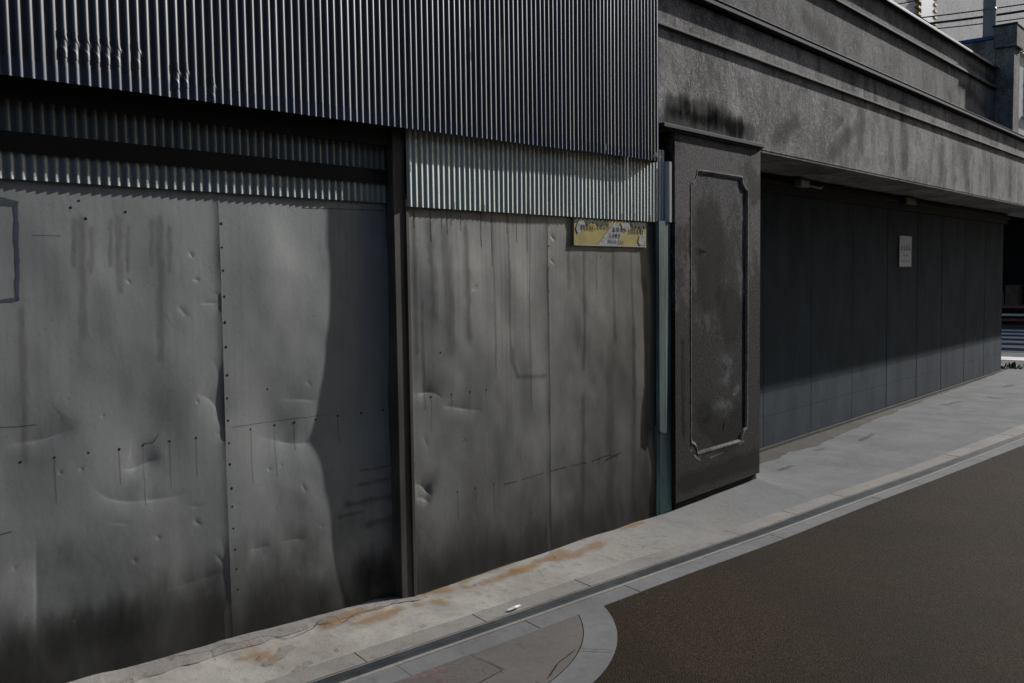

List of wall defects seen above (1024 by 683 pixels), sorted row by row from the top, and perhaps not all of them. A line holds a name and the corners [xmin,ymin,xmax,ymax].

water stain [666,95,744,139]